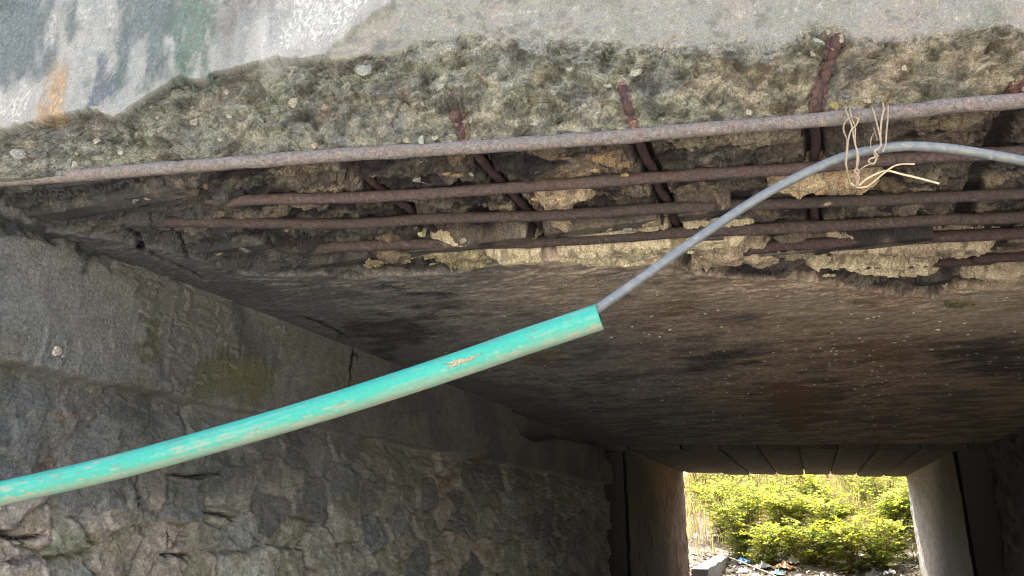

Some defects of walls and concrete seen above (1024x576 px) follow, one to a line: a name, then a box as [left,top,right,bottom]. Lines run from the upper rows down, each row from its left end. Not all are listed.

rust [809,36,843,113]
rust [1003,78,1024,94]
spalling [0,23,1024,311]
crack [298,315,358,387]